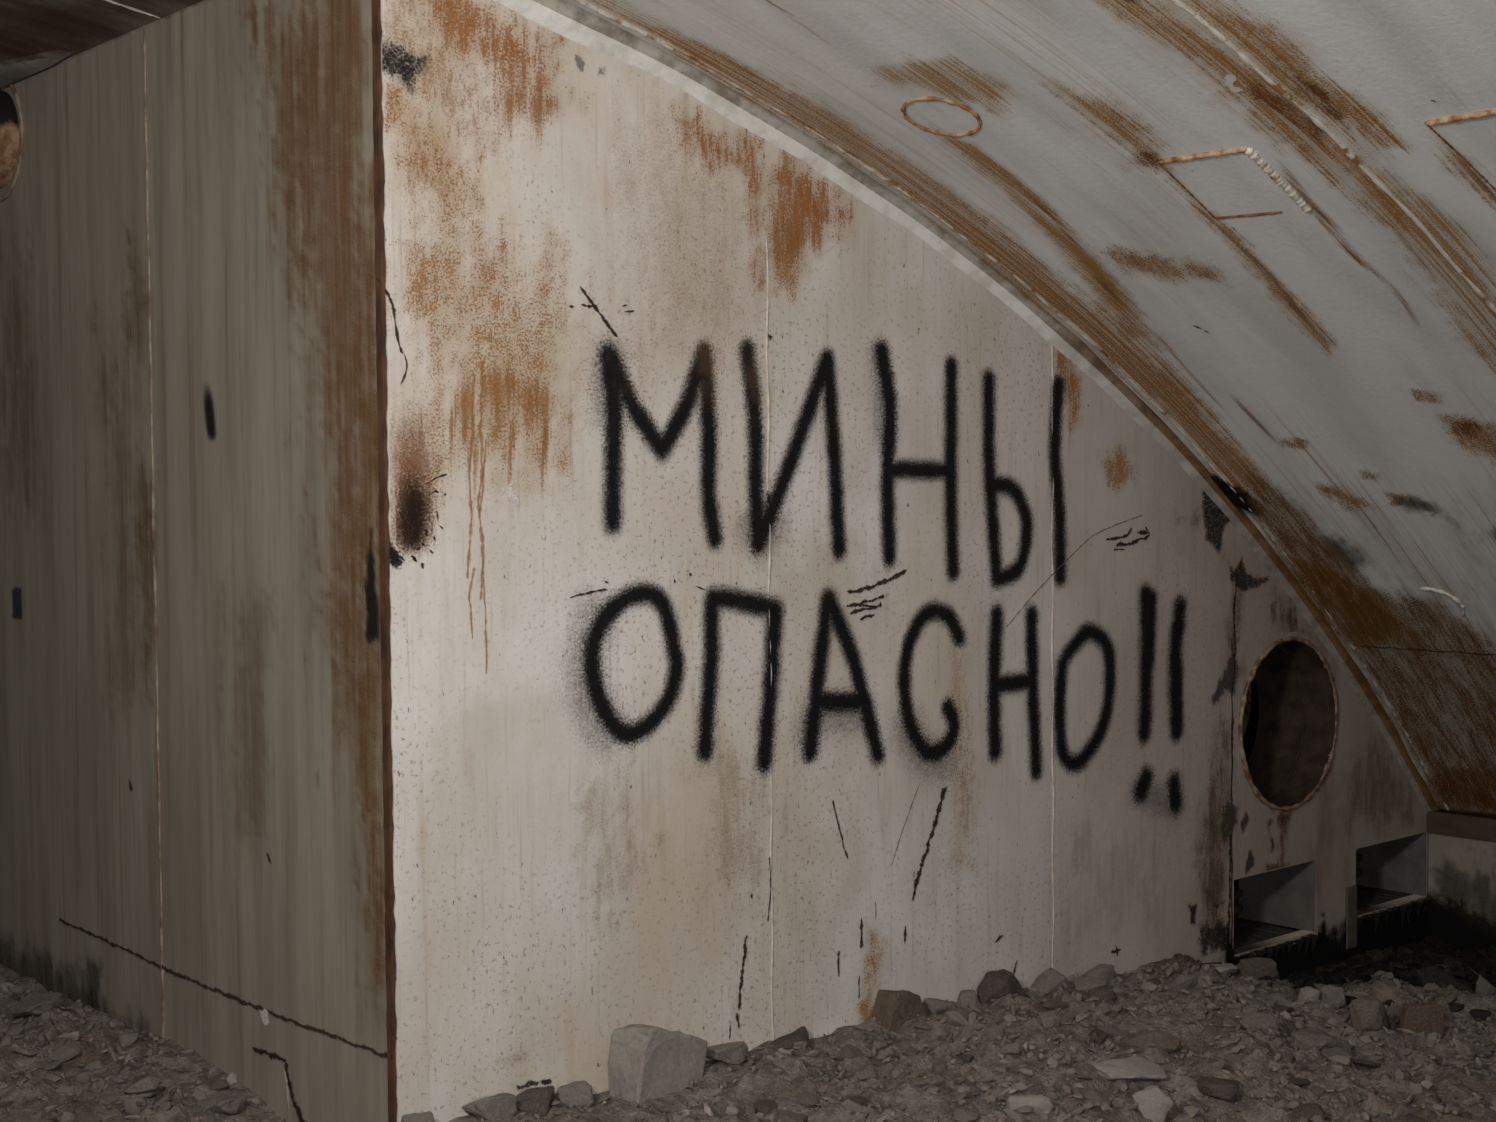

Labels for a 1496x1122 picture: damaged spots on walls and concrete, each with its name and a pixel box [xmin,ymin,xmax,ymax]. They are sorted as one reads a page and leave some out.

corrosion [585,0,1496,816]
spalling [1230,559,1269,591]
spalling [1212,655,1239,704]
corrosion [1199,717,1230,925]
crack [59,918,393,1122]